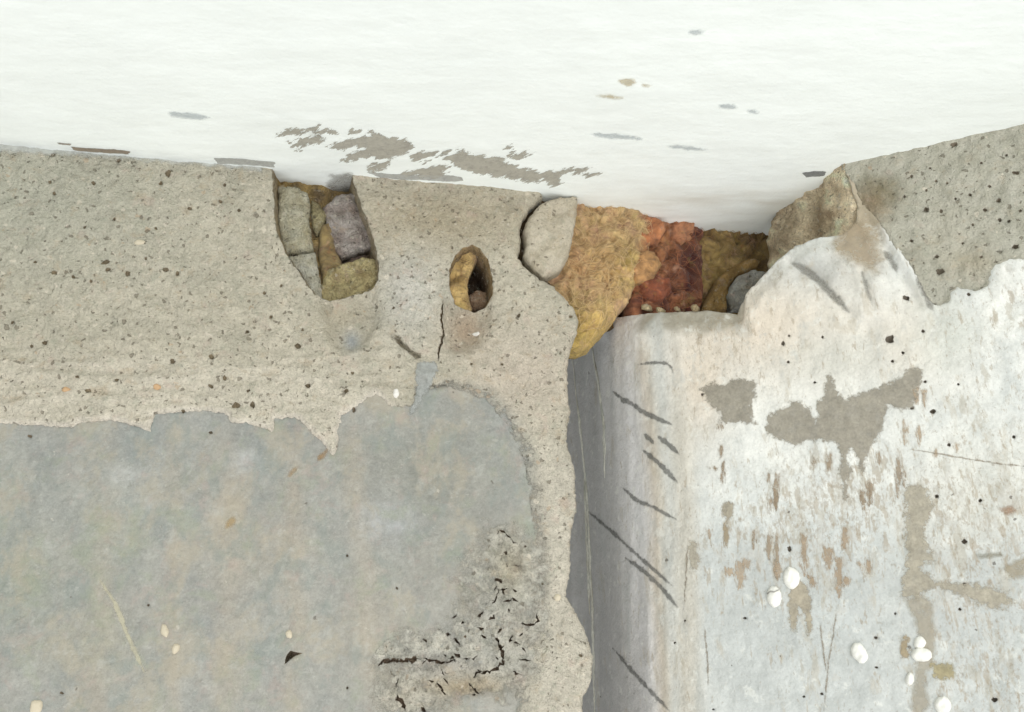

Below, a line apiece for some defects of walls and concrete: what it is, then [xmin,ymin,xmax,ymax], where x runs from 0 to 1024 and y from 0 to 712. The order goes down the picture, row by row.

spalling [766,124,1024,306]
spalling [0,124,602,712]
crack [437,304,445,360]
damp [699,368,923,500]
crack [378,530,540,712]
damp [787,582,813,636]